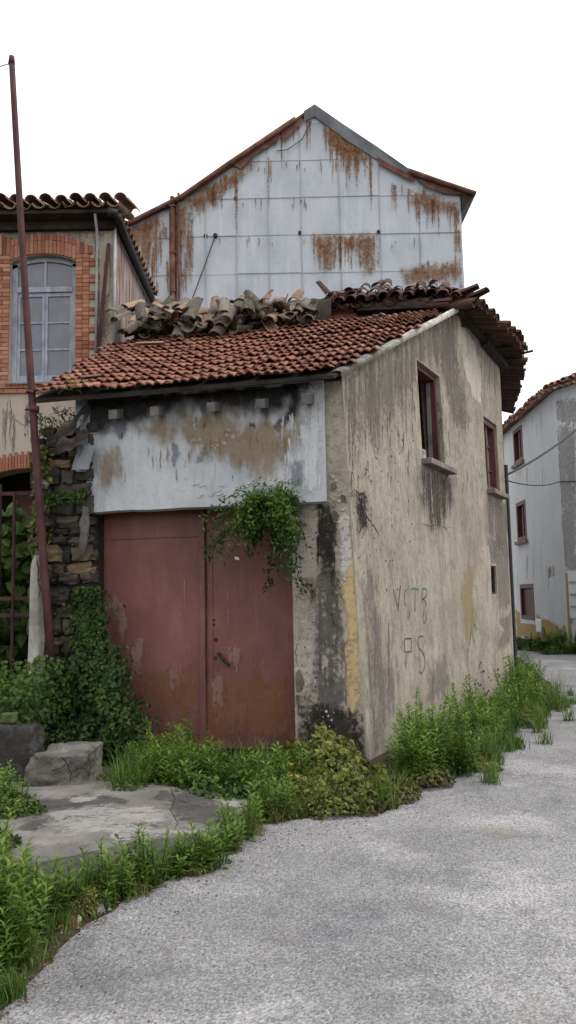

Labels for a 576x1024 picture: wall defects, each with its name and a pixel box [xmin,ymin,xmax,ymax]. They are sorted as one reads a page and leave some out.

corrosion [131,119,379,295]
corrosion [391,185,463,288]
damp [345,316,497,531]
peeling [295,475,395,760]
damp [298,504,398,755]